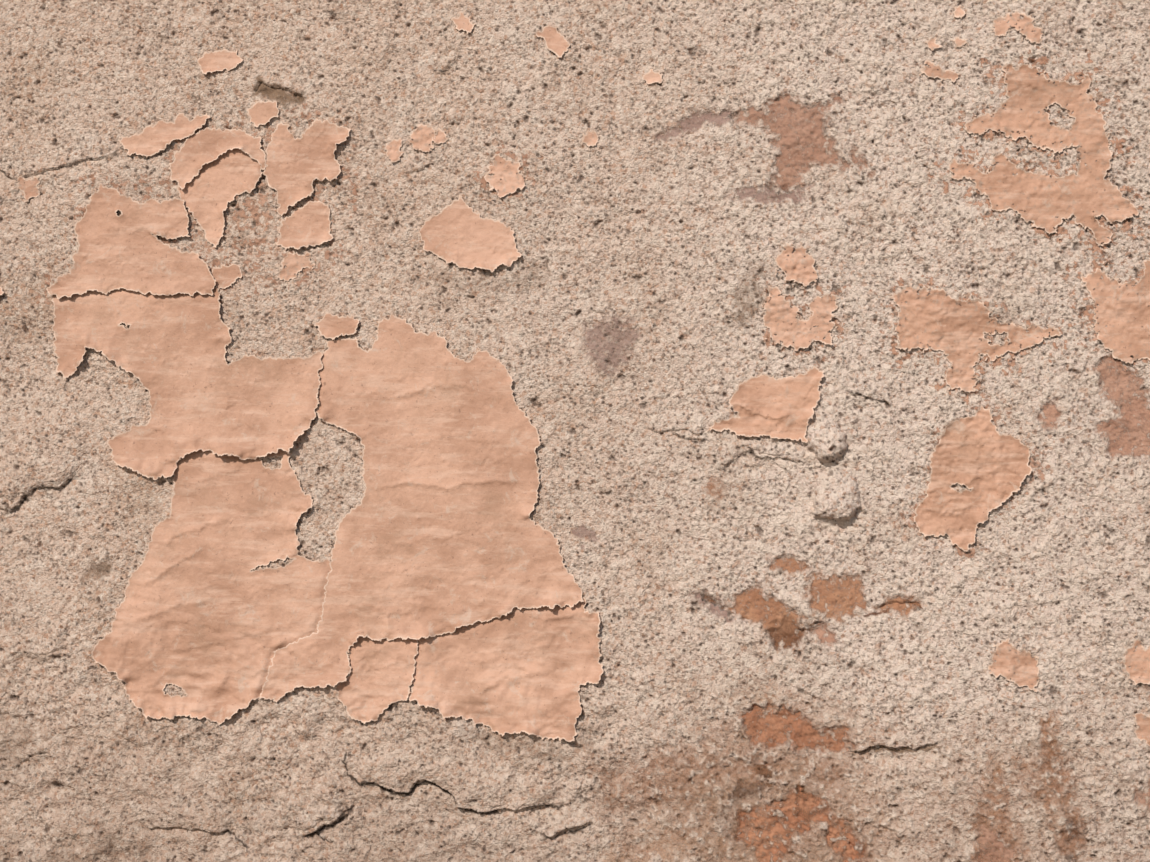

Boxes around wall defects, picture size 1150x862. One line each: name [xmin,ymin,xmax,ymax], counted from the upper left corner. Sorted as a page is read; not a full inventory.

spalling [657,94,875,203]
peeling [870,5,1150,558]
peeling [707,243,846,443]
peeling [36,76,604,742]
spalling [689,558,866,649]
spalling [880,596,920,615]
peeling [1117,633,1150,747]
crack [302,753,500,843]
crack [528,803,590,838]